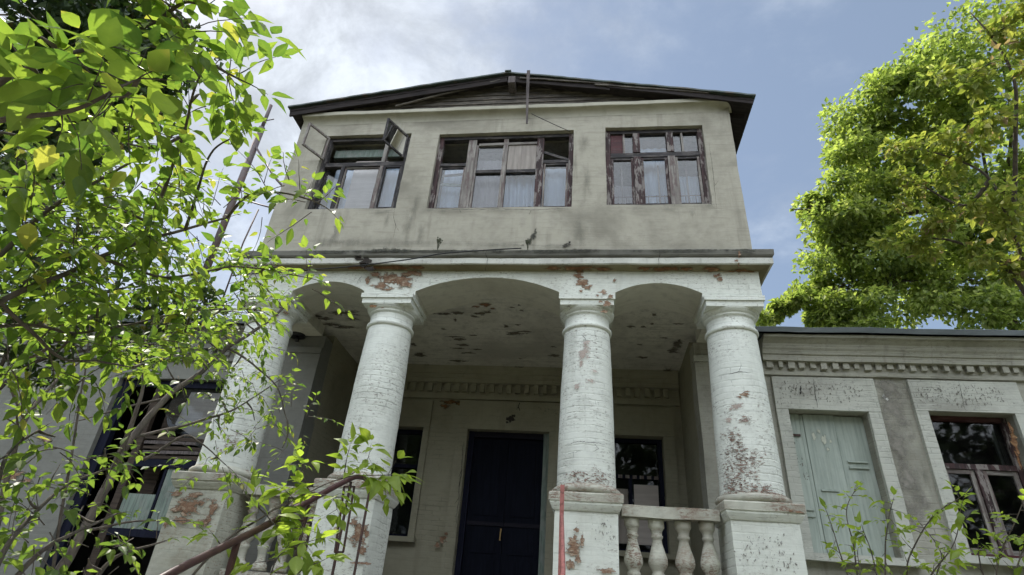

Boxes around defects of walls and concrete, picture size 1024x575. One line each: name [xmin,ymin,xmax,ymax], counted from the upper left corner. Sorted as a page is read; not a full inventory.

spalling [355,255,423,291]
spalling [573,273,617,313]
peeling [434,303,495,362]
peeling [575,340,597,389]
peeling [720,391,780,495]
peeling [565,467,611,493]
spalling [163,490,218,528]
spalling [347,516,372,565]
spalling [565,520,615,570]